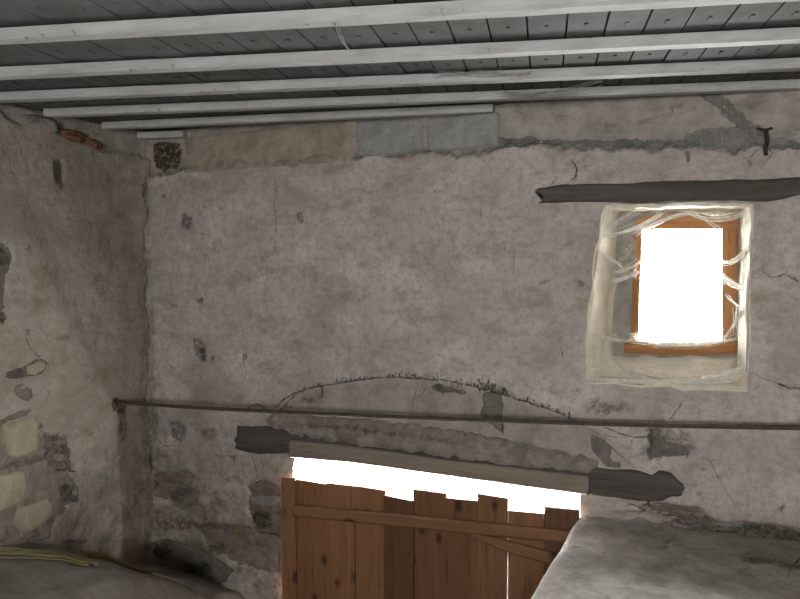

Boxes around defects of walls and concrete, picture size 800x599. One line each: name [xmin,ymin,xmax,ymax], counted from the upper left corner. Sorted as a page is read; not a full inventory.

flaking render [0,359,79,546]
flaking render [154,470,199,510]
flaking render [153,480,282,584]
crack [272,371,632,465]
flaking render [604,427,689,459]